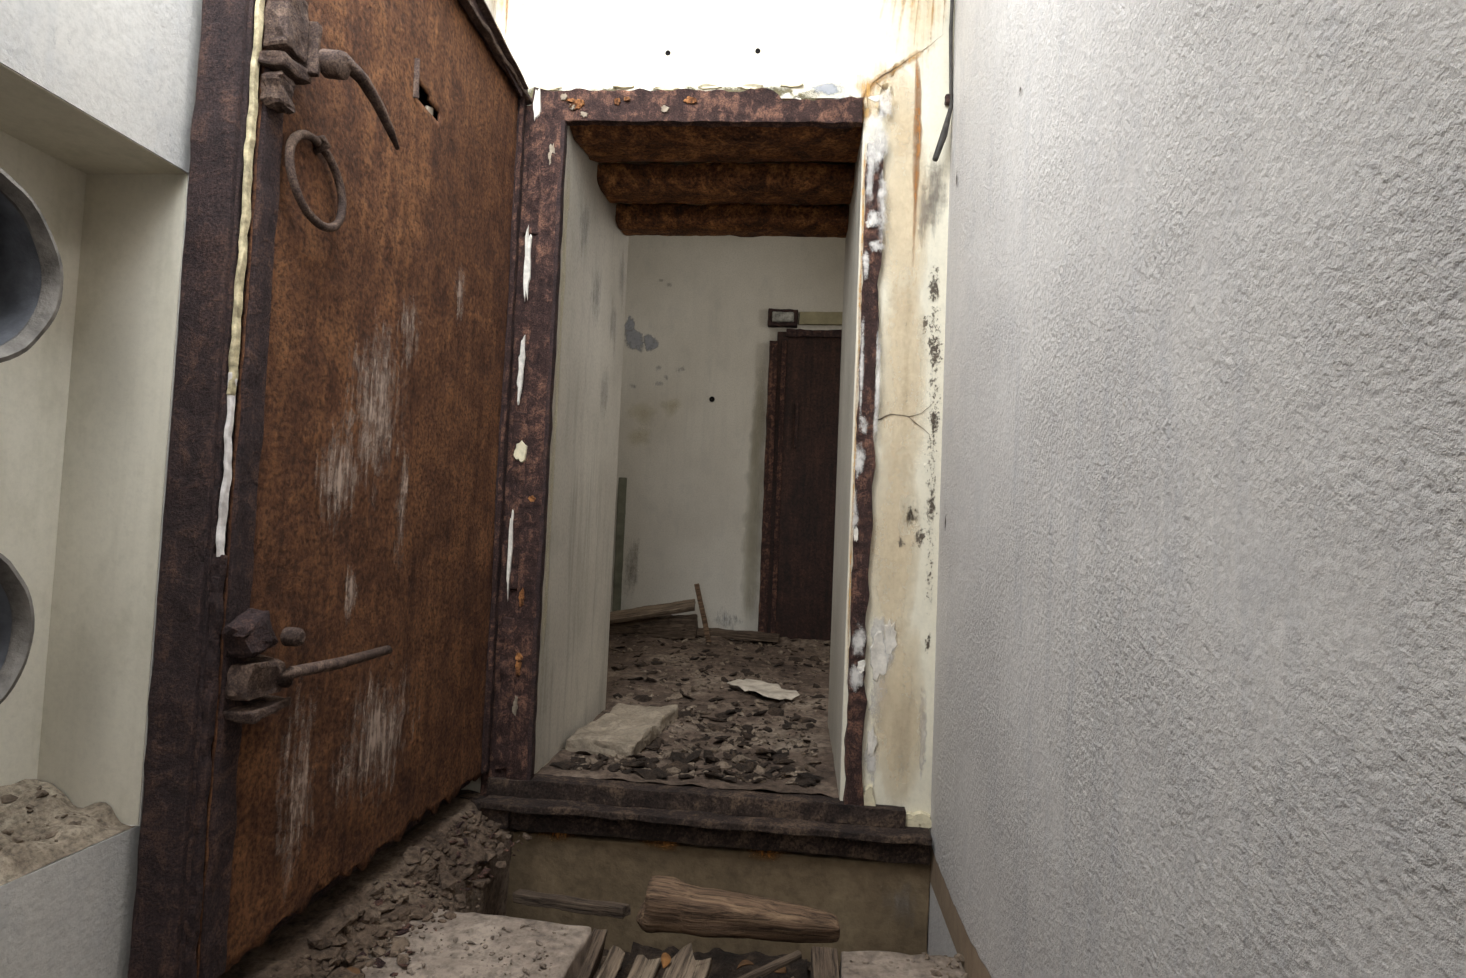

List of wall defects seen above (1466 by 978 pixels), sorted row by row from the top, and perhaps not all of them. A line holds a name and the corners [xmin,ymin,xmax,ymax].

flaking render [592,82,850,101]
peeling [863,88,923,274]
damp [921,168,941,228]
peeling [625,316,658,351]
corrosion [848,427,856,625]
peeling [855,450,864,471]
peeling [859,314,919,447]
damp [897,267,944,602]
peeling [851,480,926,806]
corrosion [352,810,523,977]